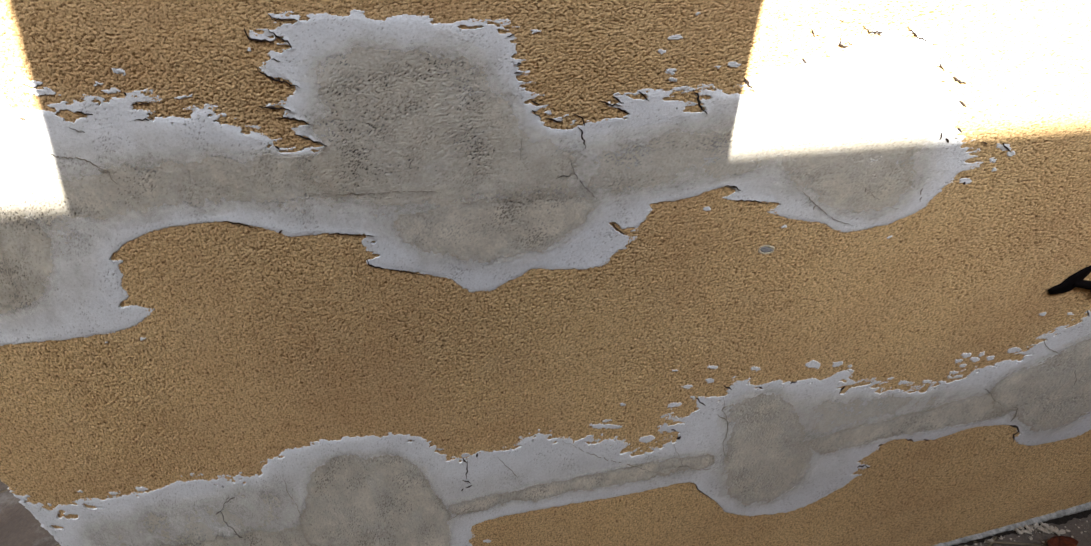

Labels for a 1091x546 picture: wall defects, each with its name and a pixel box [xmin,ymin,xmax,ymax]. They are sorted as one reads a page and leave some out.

peeling [0,9,1015,346]
crack [556,127,593,194]
peeling [7,309,1091,546]